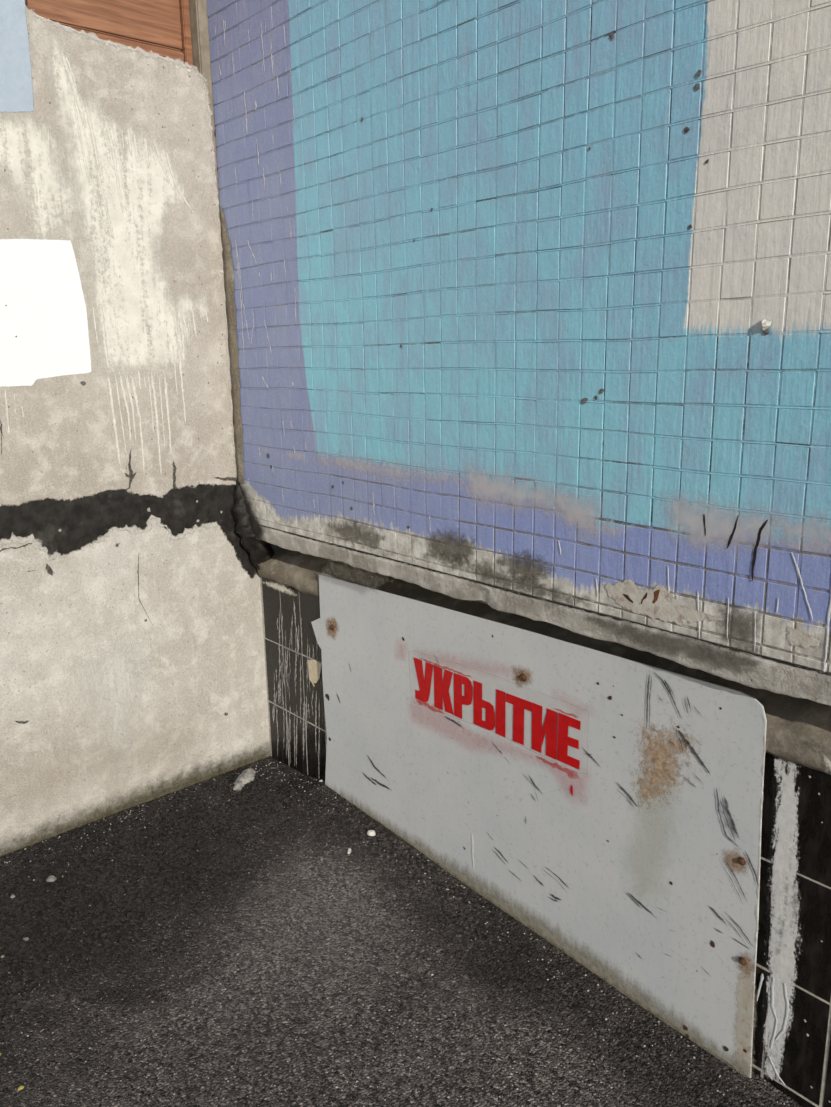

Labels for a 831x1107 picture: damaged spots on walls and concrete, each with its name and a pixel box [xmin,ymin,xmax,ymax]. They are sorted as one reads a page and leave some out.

crack [27,564,53,575]
leakage [322,562,388,588]
leakage [429,515,582,603]
peeling [605,579,724,626]